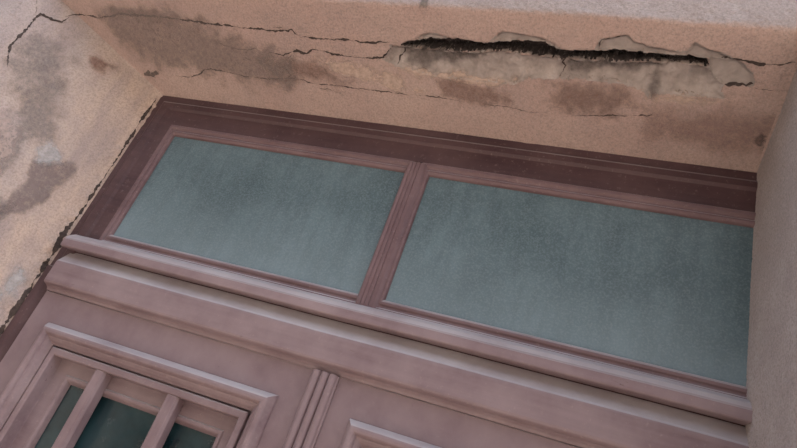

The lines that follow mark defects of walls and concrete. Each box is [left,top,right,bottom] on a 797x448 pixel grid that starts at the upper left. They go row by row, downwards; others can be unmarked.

leakage [98,7,295,87]
crack [7,0,459,101]
spalling [382,32,755,99]
crack [720,54,792,66]
leakage [0,82,75,214]
crack [575,111,652,119]